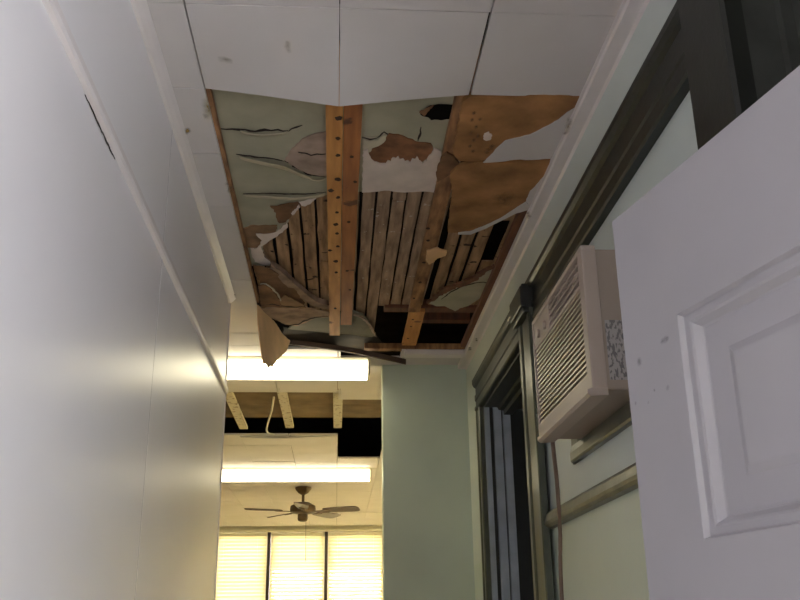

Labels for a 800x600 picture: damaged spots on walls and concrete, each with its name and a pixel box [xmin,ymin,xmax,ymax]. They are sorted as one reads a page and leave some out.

crack [85,95,115,159]
crack [221,125,302,137]
crack [236,152,326,200]
flaking render [285,131,327,177]
flaking render [362,133,459,193]
spalling [419,104,452,120]
spalling [243,198,329,326]
flaking render [426,247,447,265]